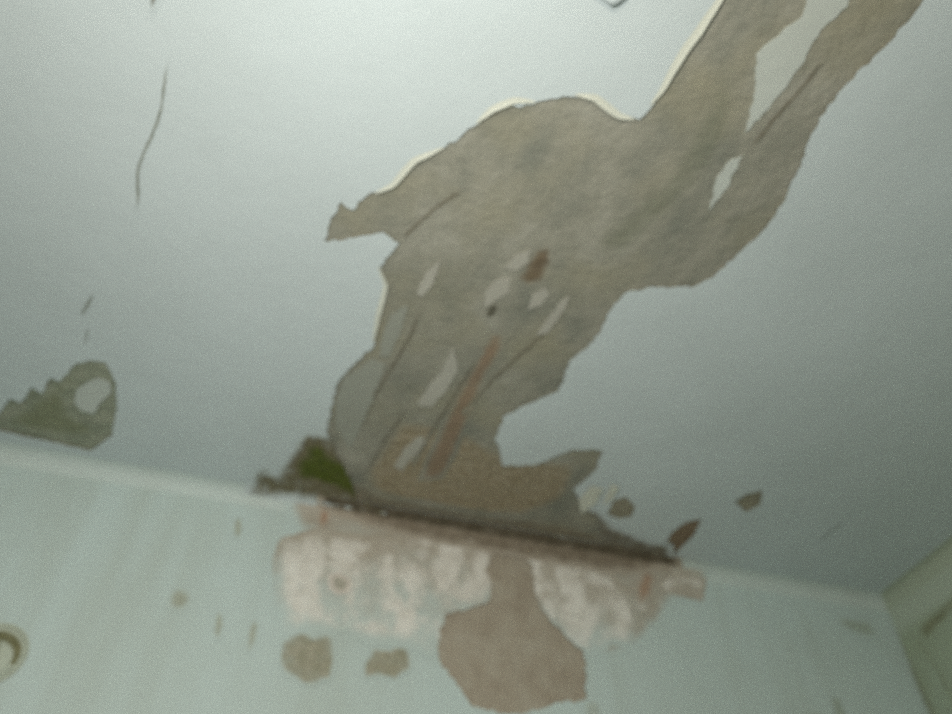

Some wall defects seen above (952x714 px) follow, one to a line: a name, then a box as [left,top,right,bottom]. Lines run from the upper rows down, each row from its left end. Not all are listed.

crack [144,0,164,21]
crack [133,53,171,219]
peeling [325,0,921,530]
peeling [0,360,117,450]
water stain [243,427,707,659]
spalling [666,519,701,554]